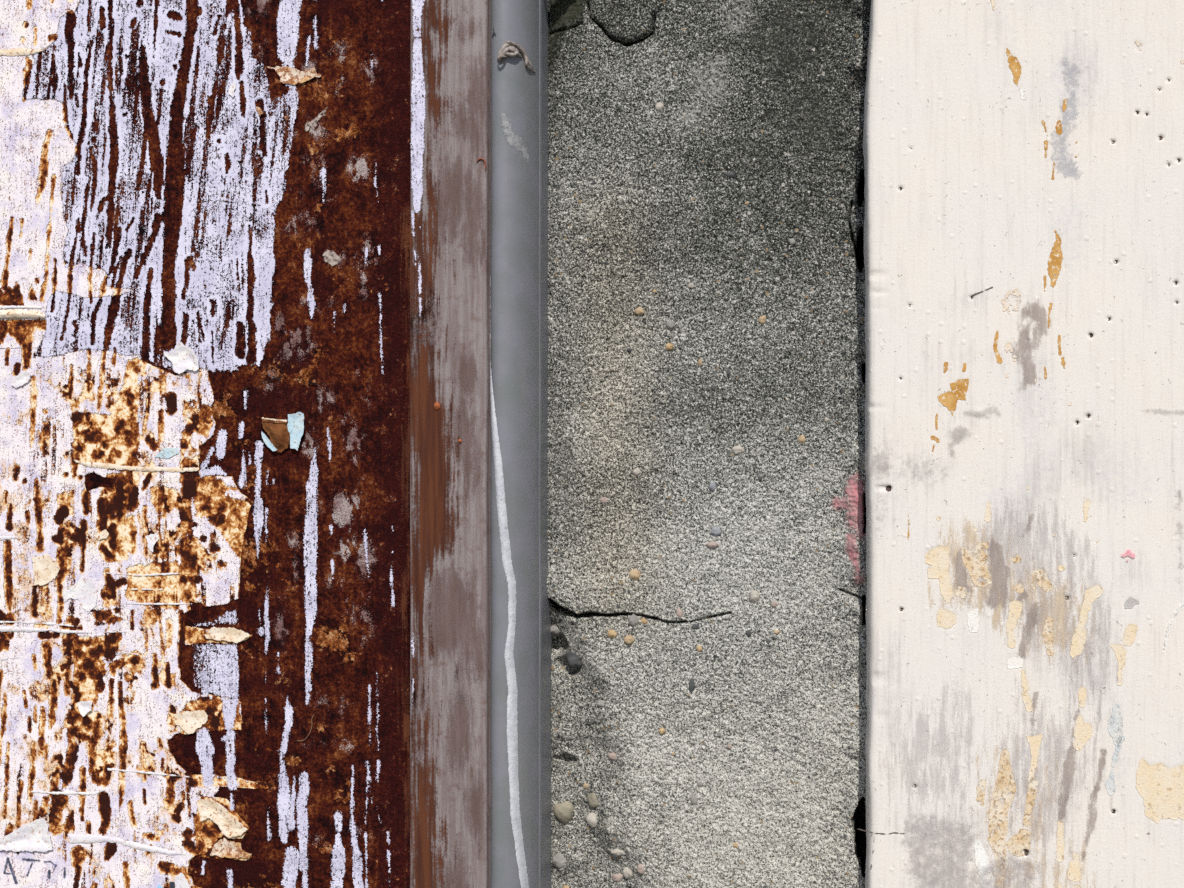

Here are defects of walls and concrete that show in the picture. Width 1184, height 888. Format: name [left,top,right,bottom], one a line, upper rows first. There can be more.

peeling [276,0,319,68]
peeling [303,248,316,319]
peeling [0,0,310,888]
corrosion [394,0,487,888]
peeling [303,428,335,704]
crack [549,599,731,624]
peeling [330,672,381,888]